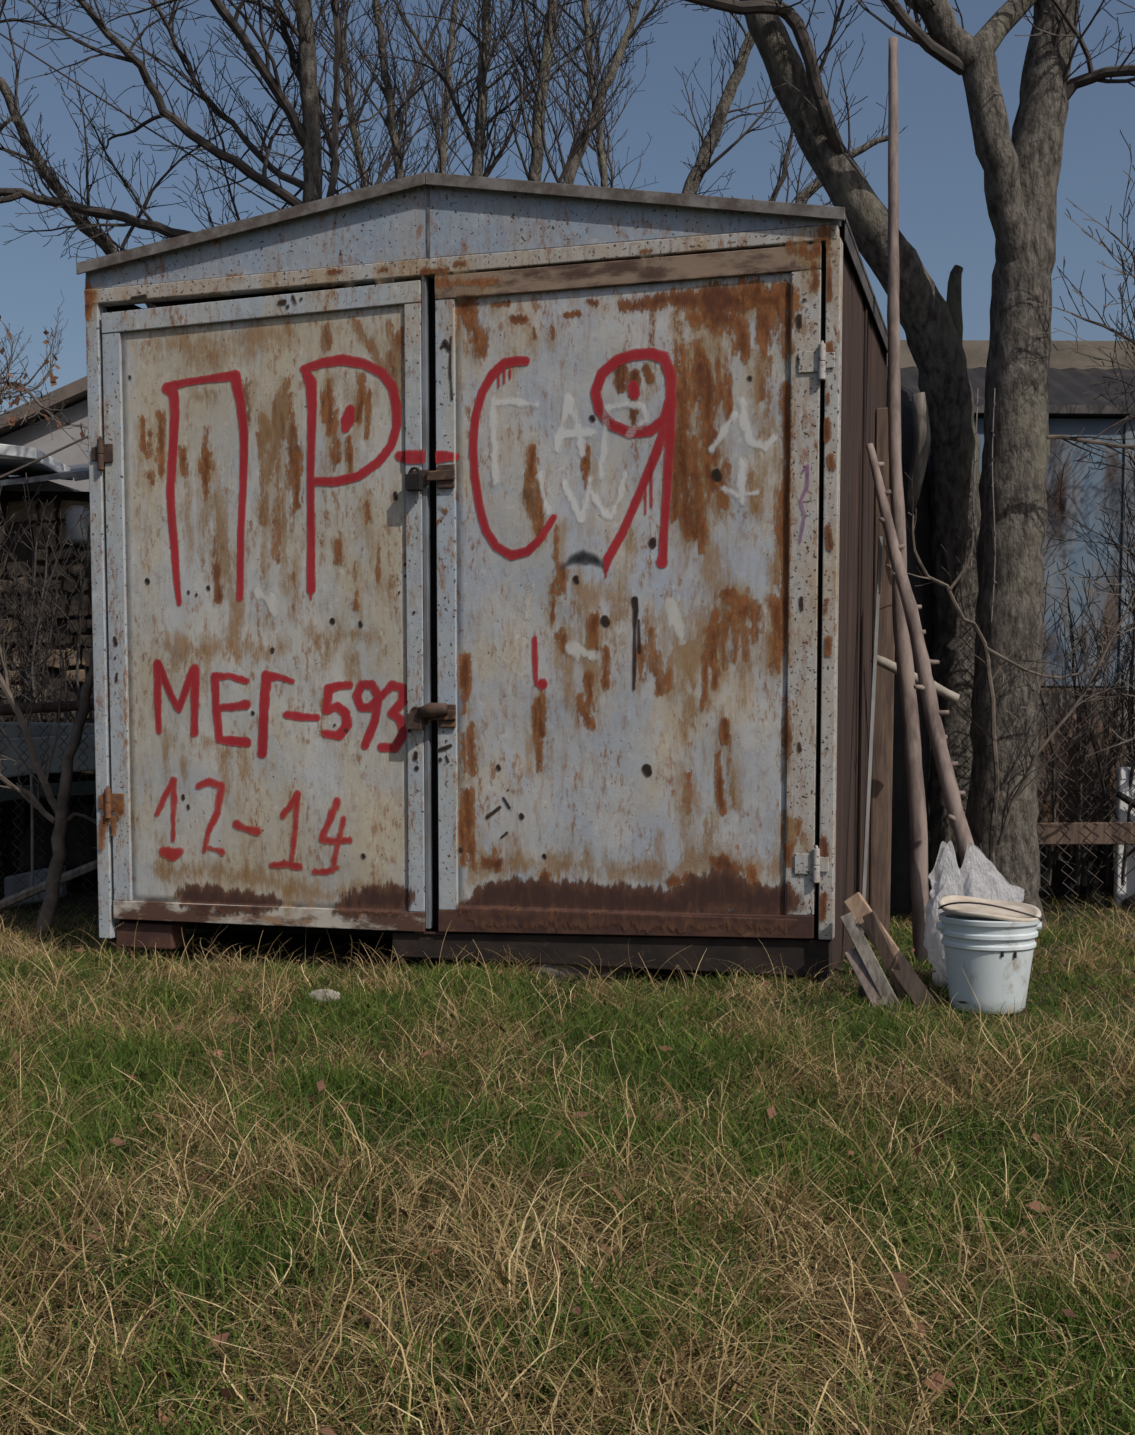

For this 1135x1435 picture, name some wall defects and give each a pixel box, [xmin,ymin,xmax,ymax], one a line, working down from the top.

corrosion [420,260,598,360]
corrosion [320,316,404,473]
corrosion [138,410,215,502]
corrosion [212,540,224,603]
corrosion [243,376,304,611]
corrosion [523,444,570,662]
corrosion [580,443,596,489]
corrosion [613,223,837,712]
corrosion [576,611,611,731]
corrosion [453,652,808,935]
corrosion [175,882,282,916]
corrosion [332,880,415,922]